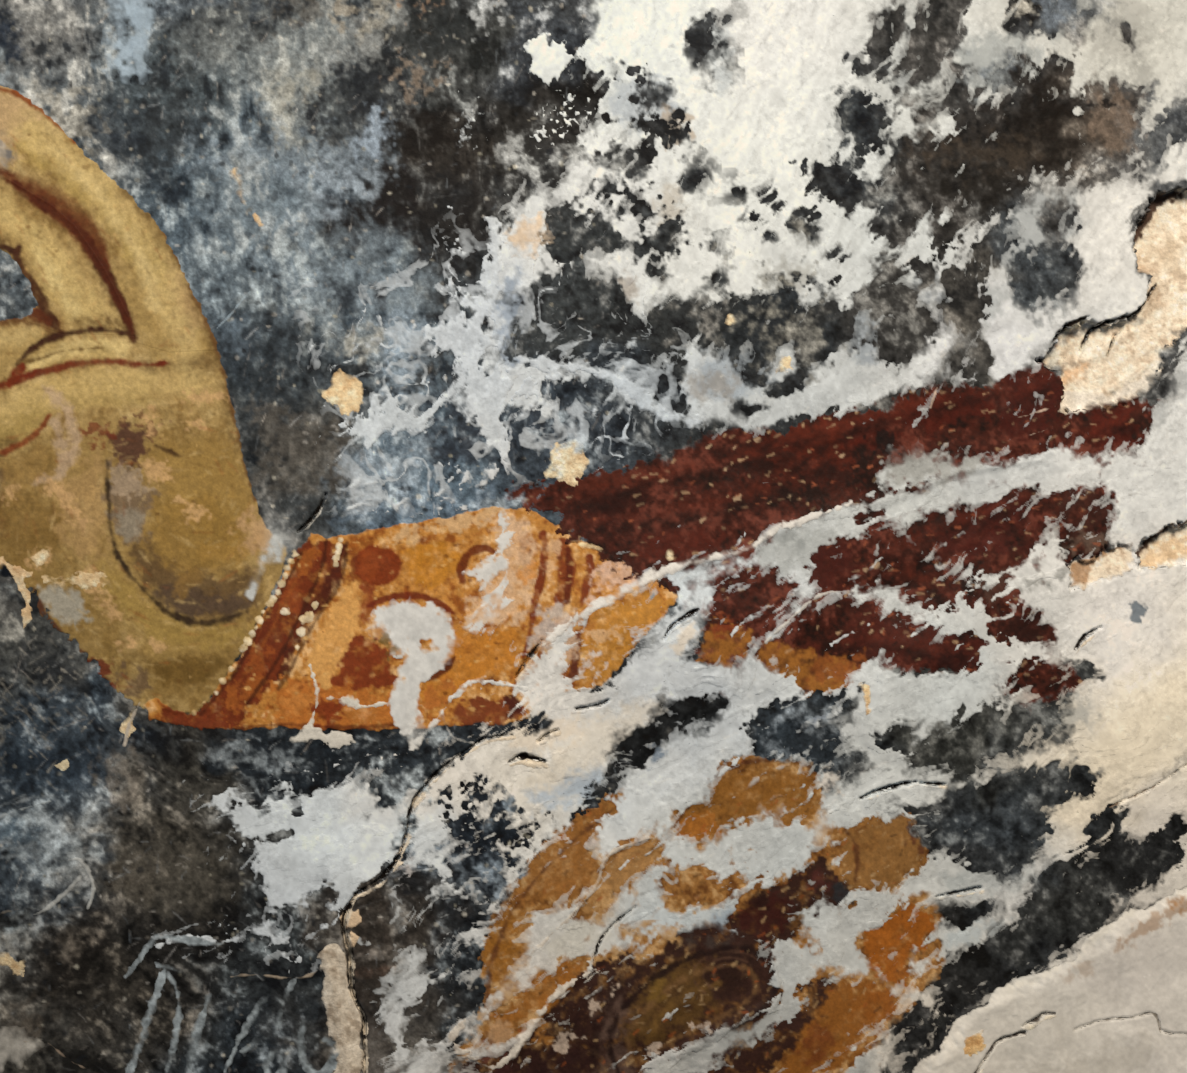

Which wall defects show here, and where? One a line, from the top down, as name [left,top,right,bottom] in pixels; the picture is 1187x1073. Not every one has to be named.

peeling [1072,105,1085,118]
flaking render [724,313,738,326]
peeling [479,275,656,433]
flaking render [320,368,364,416]
peeling [1006,391,1045,430]
flaking render [543,438,590,487]
flaking render [577,542,630,559]
peeling [361,501,517,761]
crack [341,699,608,1073]
peeling [1026,833,1187,974]
flaking render [306,939,366,1073]
crack [974,1012,1187,1073]